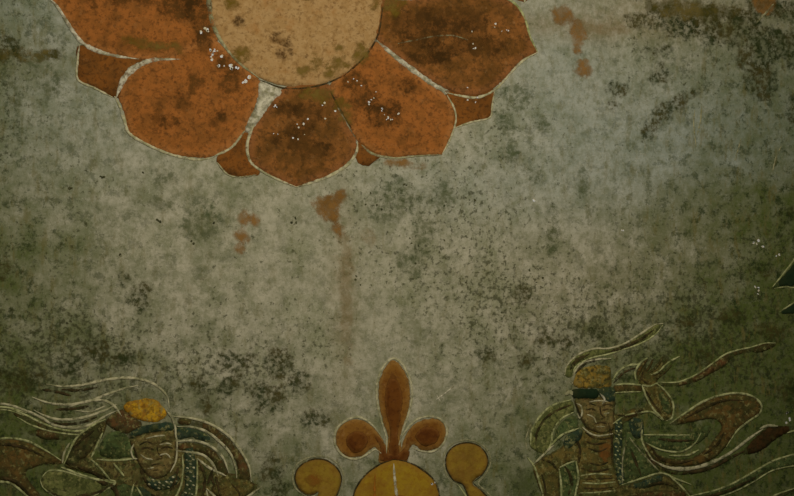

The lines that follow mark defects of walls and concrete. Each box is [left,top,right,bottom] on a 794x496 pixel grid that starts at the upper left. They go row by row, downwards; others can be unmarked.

leakage [624,0,794,101]
leakage [641,90,696,139]
leakage [190,348,309,413]
leakage [301,411,330,426]